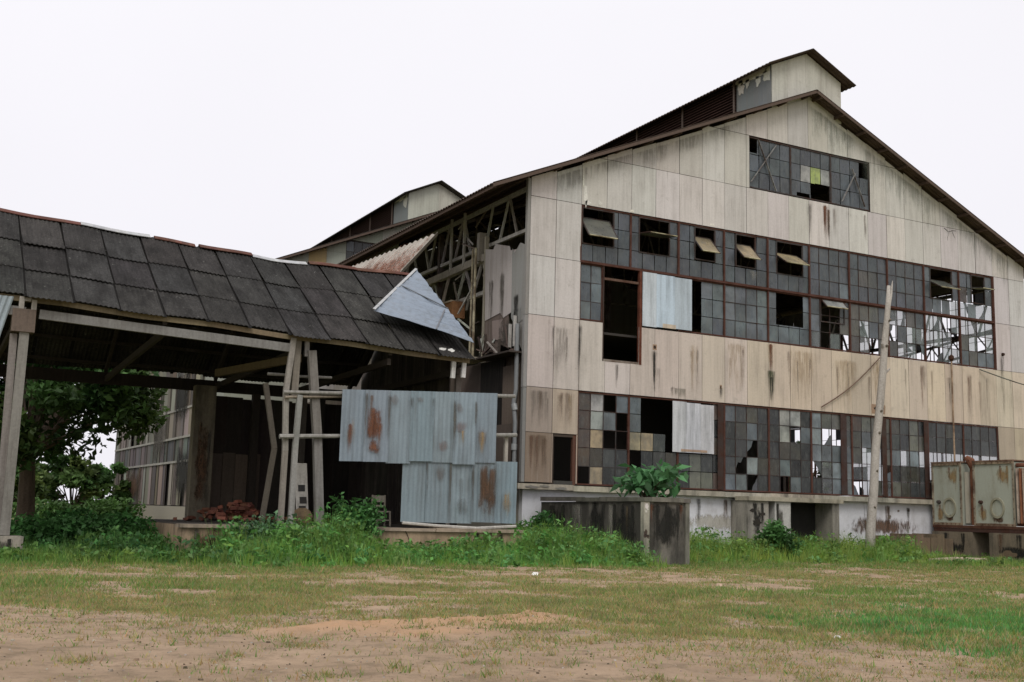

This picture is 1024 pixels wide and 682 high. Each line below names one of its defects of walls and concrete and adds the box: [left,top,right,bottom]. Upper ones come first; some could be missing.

corrosion [365,394,391,453]
corrosion [472,467,506,511]
leakage [591,504,636,543]
leakage [653,499,731,544]
leakage [753,503,783,533]
leakage [853,506,915,534]